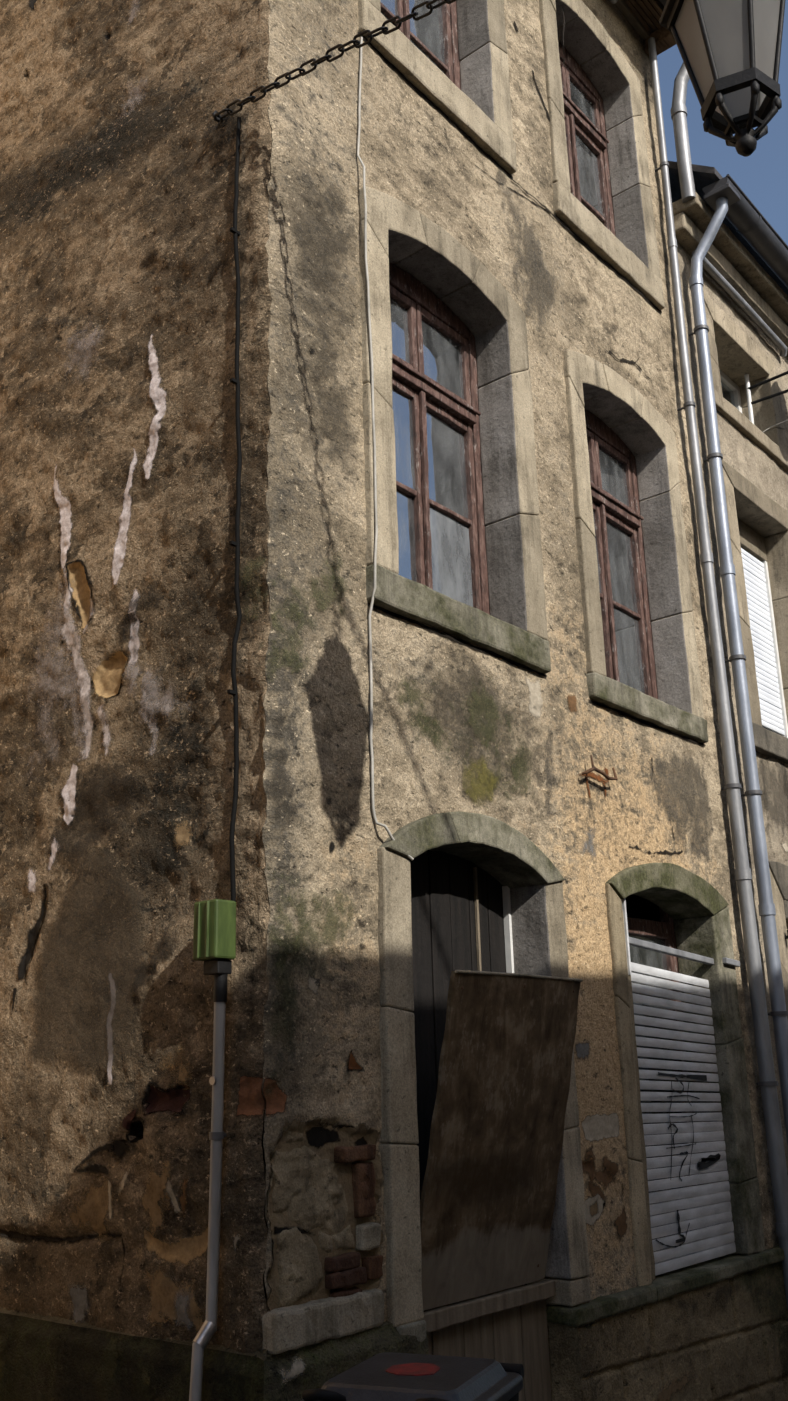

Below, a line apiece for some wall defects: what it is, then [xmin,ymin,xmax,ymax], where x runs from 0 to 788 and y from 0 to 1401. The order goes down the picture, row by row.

spalling [66,559,92,632]
spalling [92,651,128,699]
water stain [399,682,449,751]
water stain [464,689,555,814]
crack [12,883,47,1011]
crack [75,1139,132,1170]
spalling [140,1160,208,1333]
spalling [236,1076,384,1380]